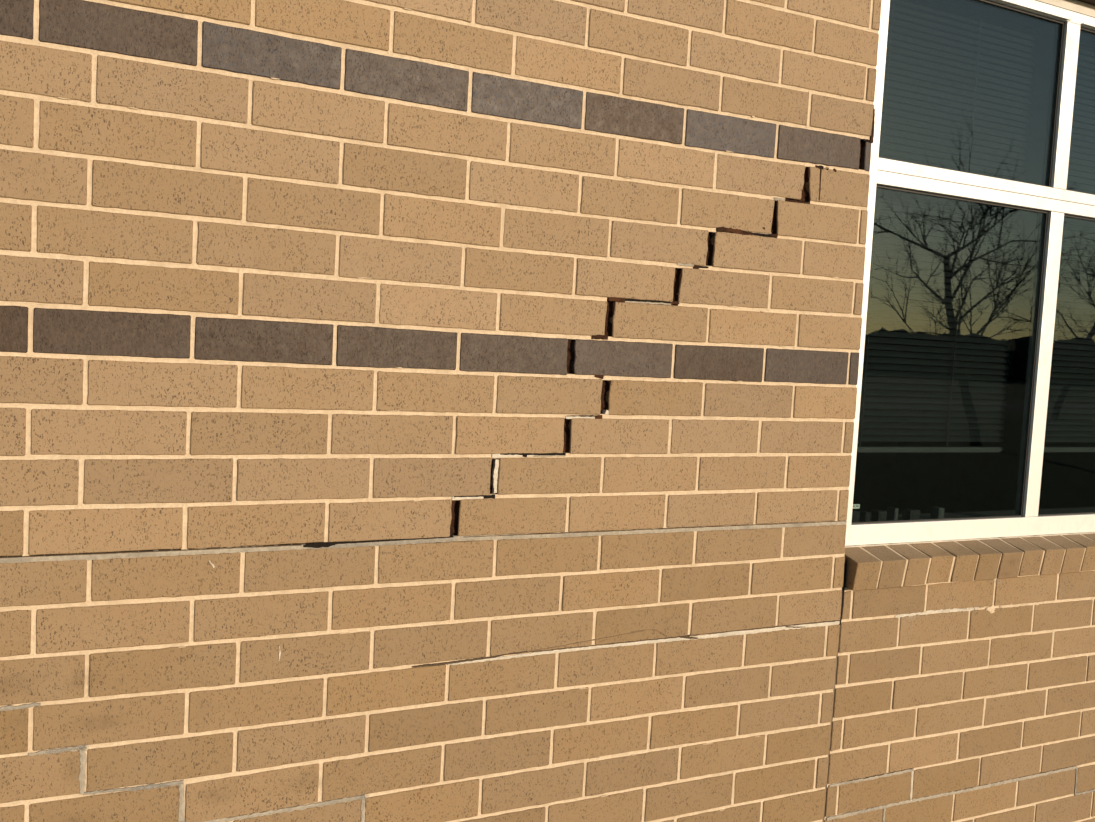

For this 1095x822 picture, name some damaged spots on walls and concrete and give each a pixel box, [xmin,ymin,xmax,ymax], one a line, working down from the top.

crack [0,109,875,558]
crack [412,558,847,667]
crack [956,766,1074,791]